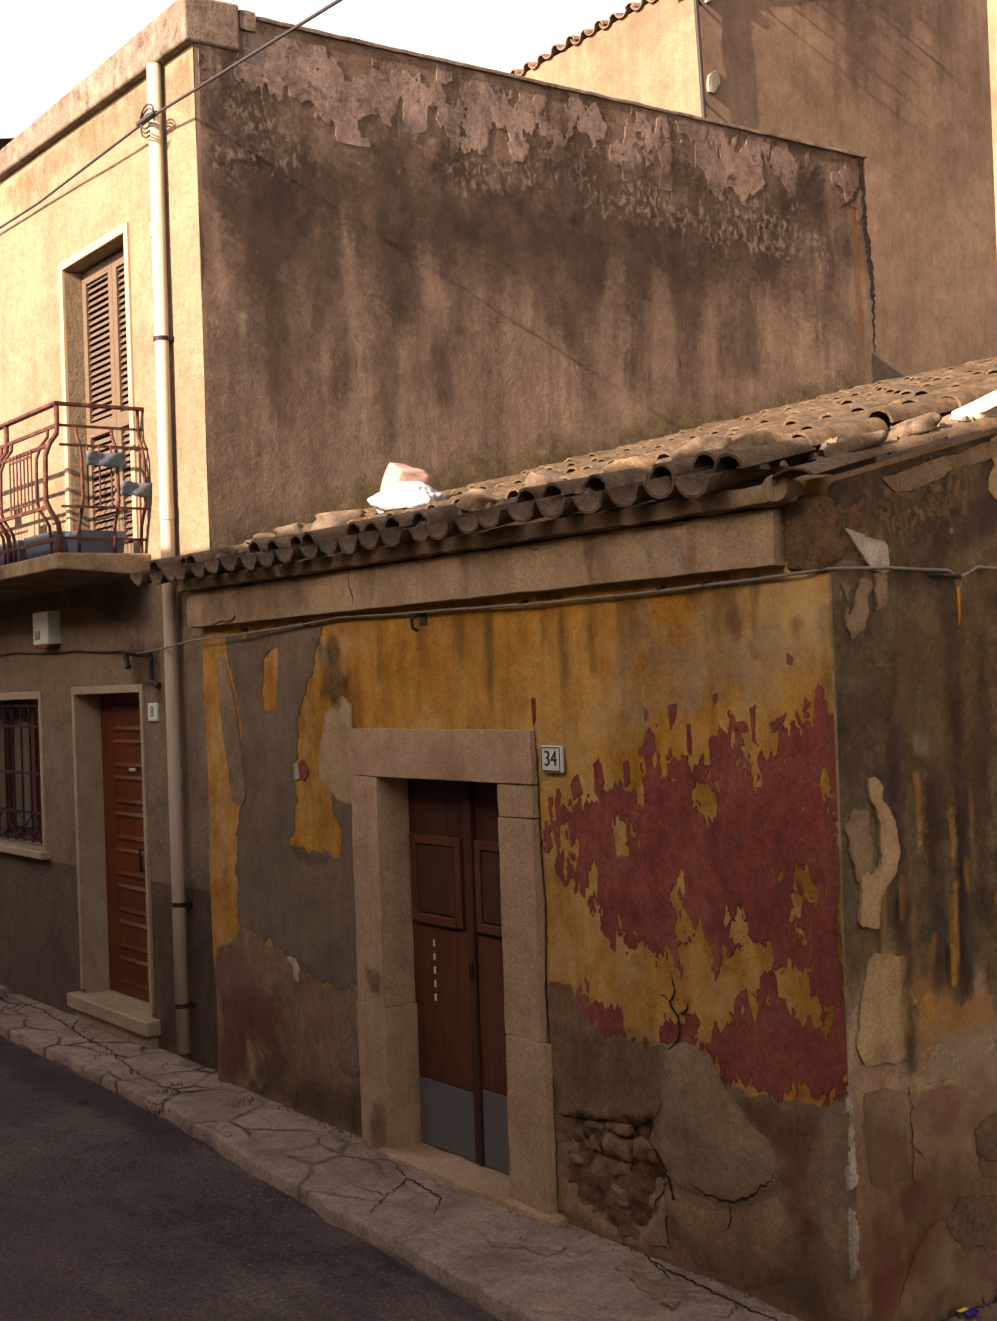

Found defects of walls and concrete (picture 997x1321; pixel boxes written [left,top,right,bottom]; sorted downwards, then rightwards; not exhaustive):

flaking render [198,31,816,206]
damp [198,53,851,349]
flaking render [831,163,865,222]
crack [838,152,876,352]
damp [214,481,382,549]
damp [430,371,854,491]
flaking render [882,433,997,501]
damp [828,433,997,1074]
crack [1,994,211,1106]
crack [532,698,778,1321]
peeling [542,682,917,1321]
crack [353,1162,441,1215]